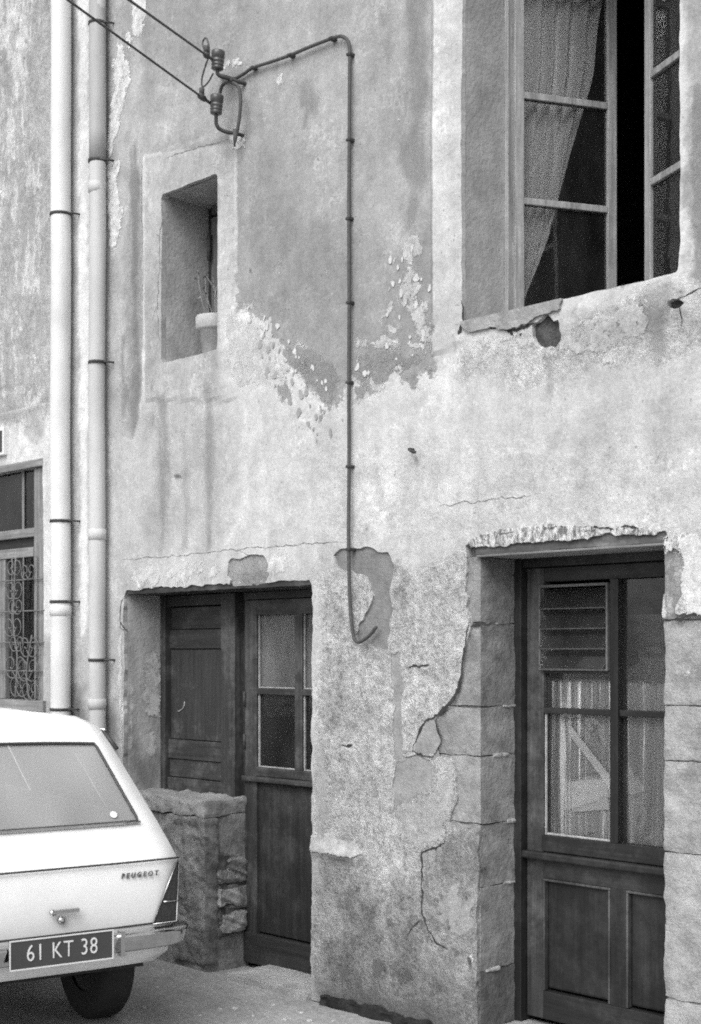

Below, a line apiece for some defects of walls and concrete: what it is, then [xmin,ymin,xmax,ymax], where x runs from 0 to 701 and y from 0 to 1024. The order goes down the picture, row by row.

peeling [106,0,146,248]
peeling [225,301,341,438]
peeling [354,234,432,403]
peeling [476,299,651,364]
crack [442,496,523,506]
spalling [131,550,288,588]
spalling [468,523,701,619]
spalling [335,547,441,822]
crack [407,840,447,949]
flaking render [439,883,474,935]